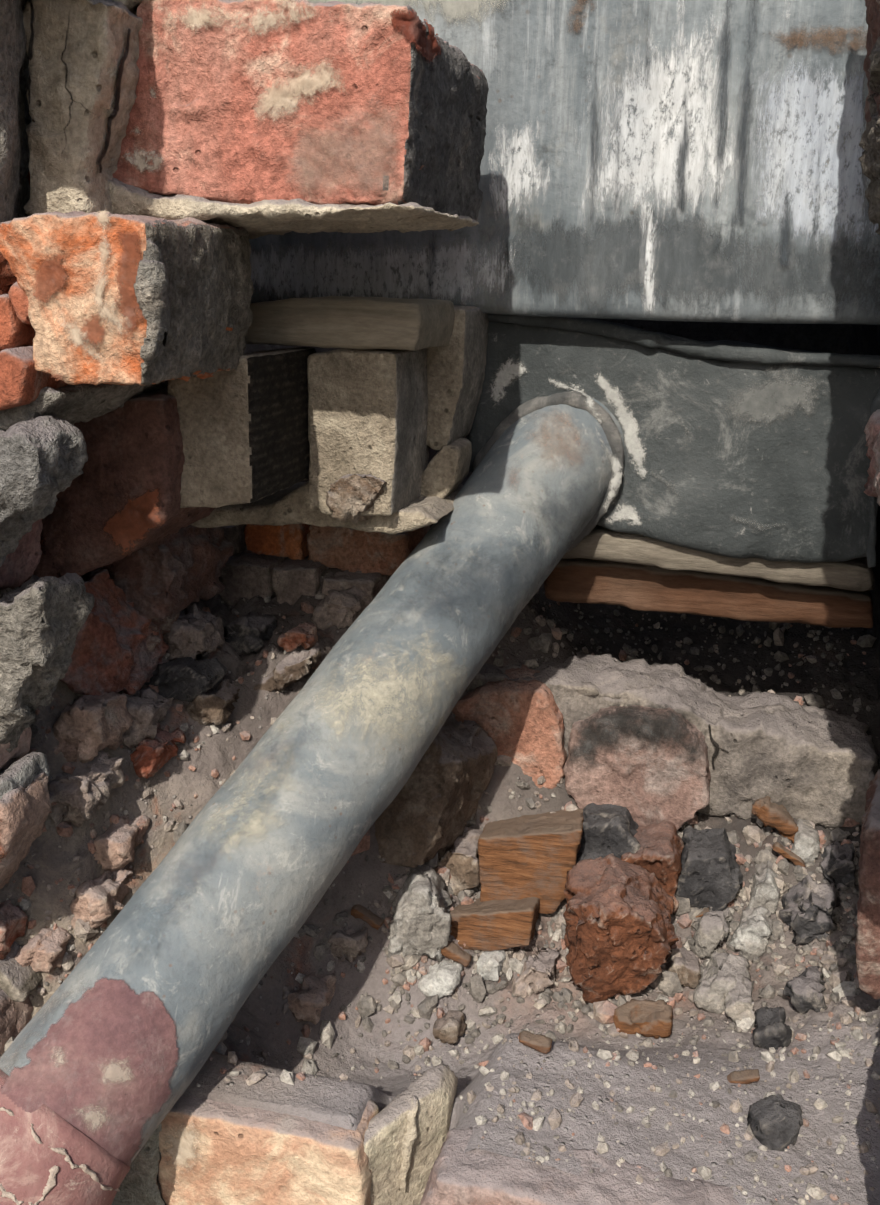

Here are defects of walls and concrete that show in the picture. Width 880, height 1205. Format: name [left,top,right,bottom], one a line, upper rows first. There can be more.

crack [28,0,131,173]
water stain [250,21,880,311]
efflorescence [491,359,527,407]
efflorescence [549,375,672,525]
water stain [411,544,541,619]
peeling [102,1061,131,1083]
peeling [80,1106,106,1129]